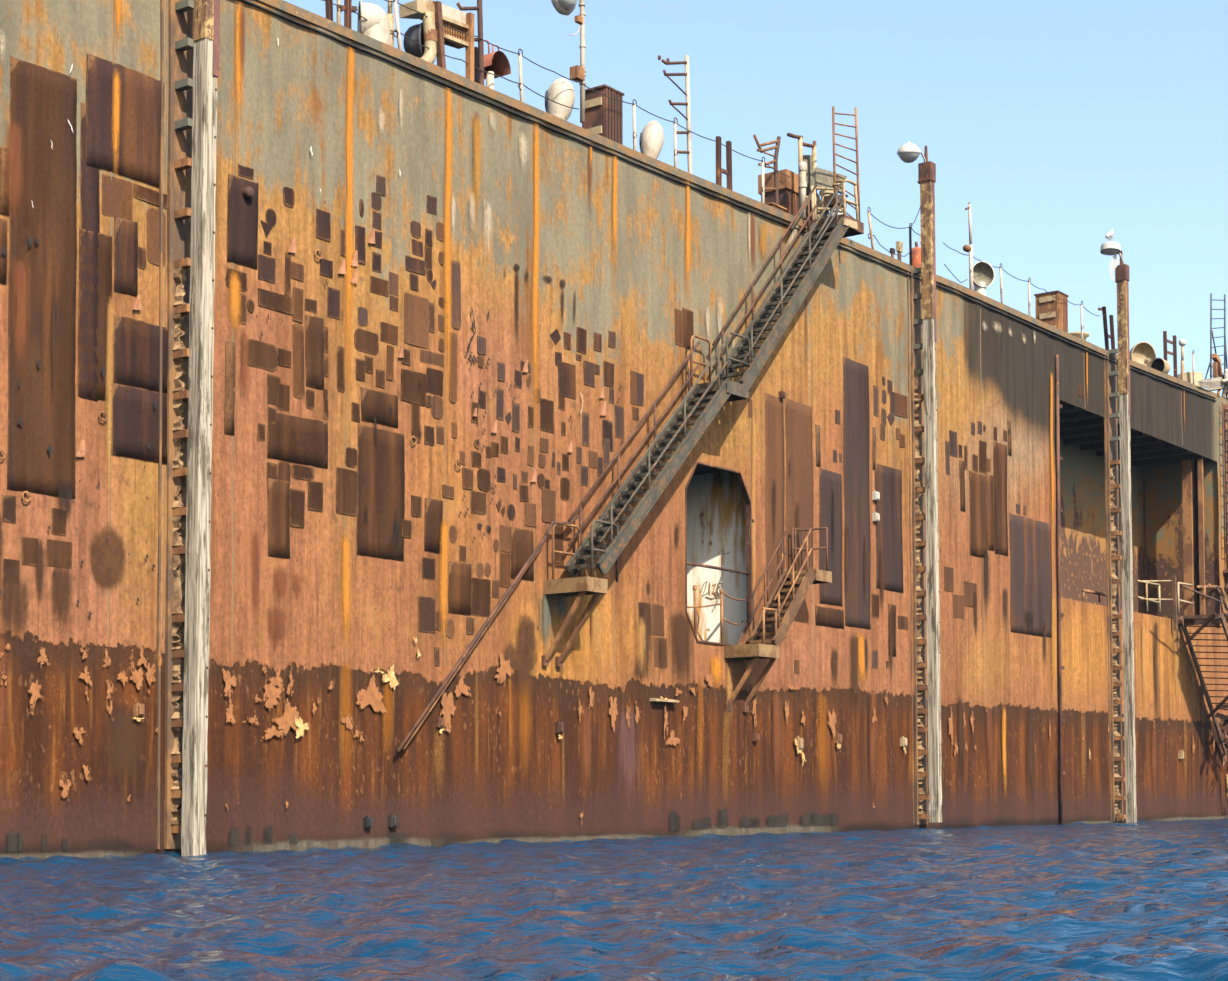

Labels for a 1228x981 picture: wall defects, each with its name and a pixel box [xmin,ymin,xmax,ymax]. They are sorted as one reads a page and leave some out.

rust [345,46,354,362]
water stain [60,485,72,514]
peeling [27,644,51,715]
peeling [59,764,91,800]
water stain [0,516,181,858]
peeling [78,642,163,720]
rust [103,706,147,790]
peeling [222,663,334,741]
peeling [341,665,400,742]
rust [698,657,751,766]
rust [851,635,868,699]
rust [987,708,1006,779]